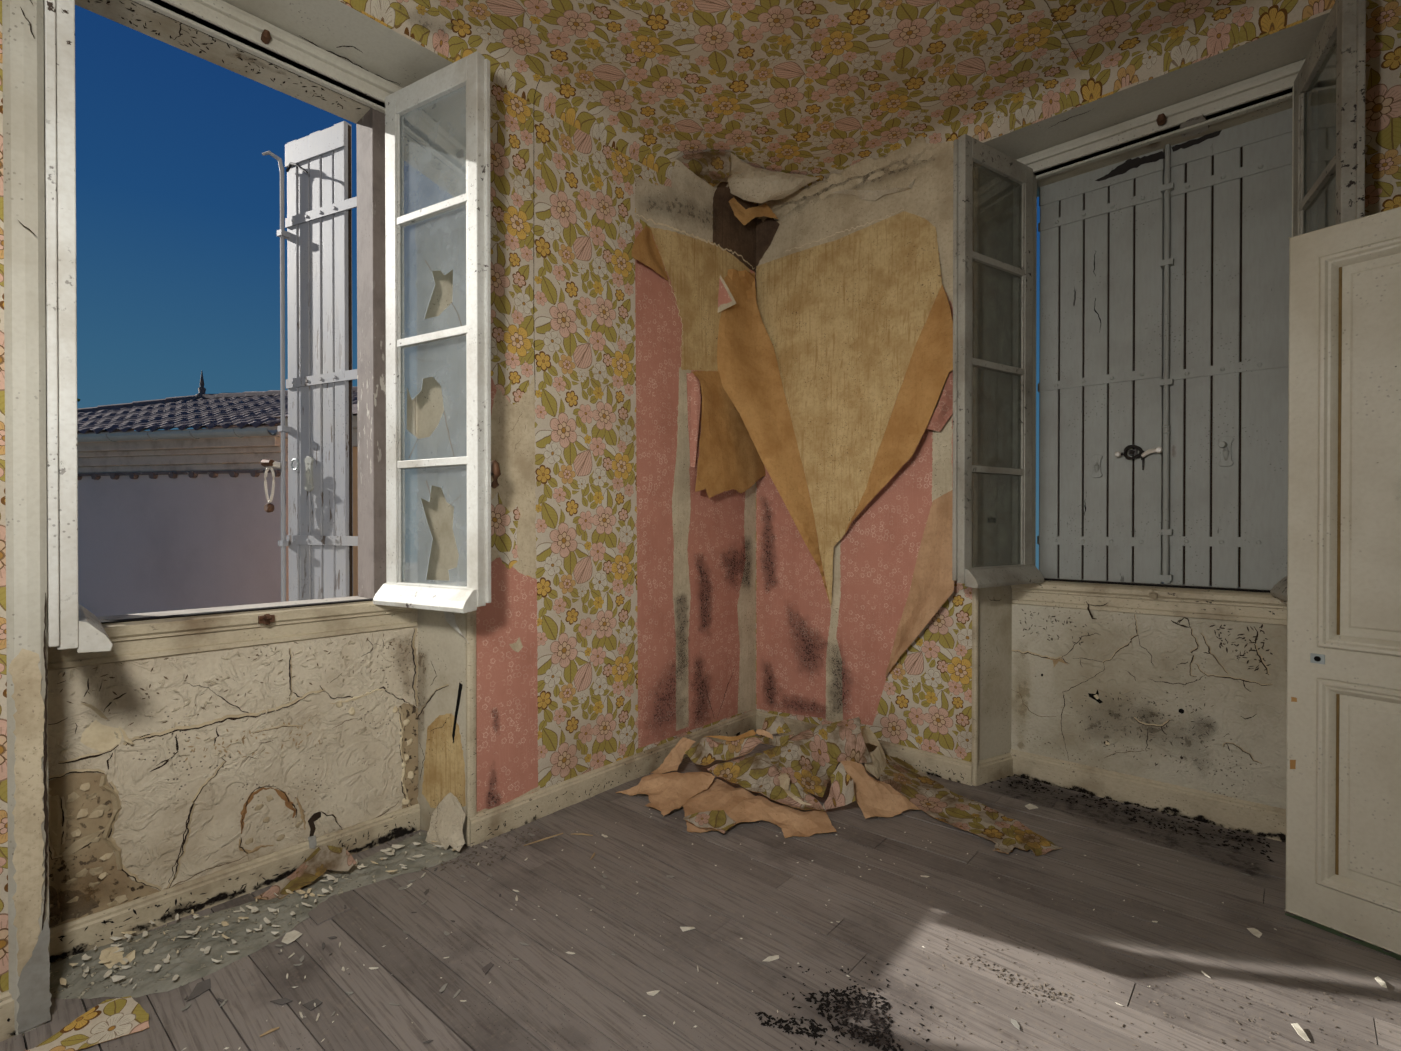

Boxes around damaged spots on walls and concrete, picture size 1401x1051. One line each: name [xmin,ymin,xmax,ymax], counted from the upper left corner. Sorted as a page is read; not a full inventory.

flaking render [634,157,720,242]
flaking render [758,136,953,306]
peeling [1095,115,1222,181]
flaking render [8,648,209,977]
crack [42,593,463,930]
flaking render [185,628,641,892]
damp [645,503,775,738]
damp [761,612,851,716]
crack [997,602,1273,764]